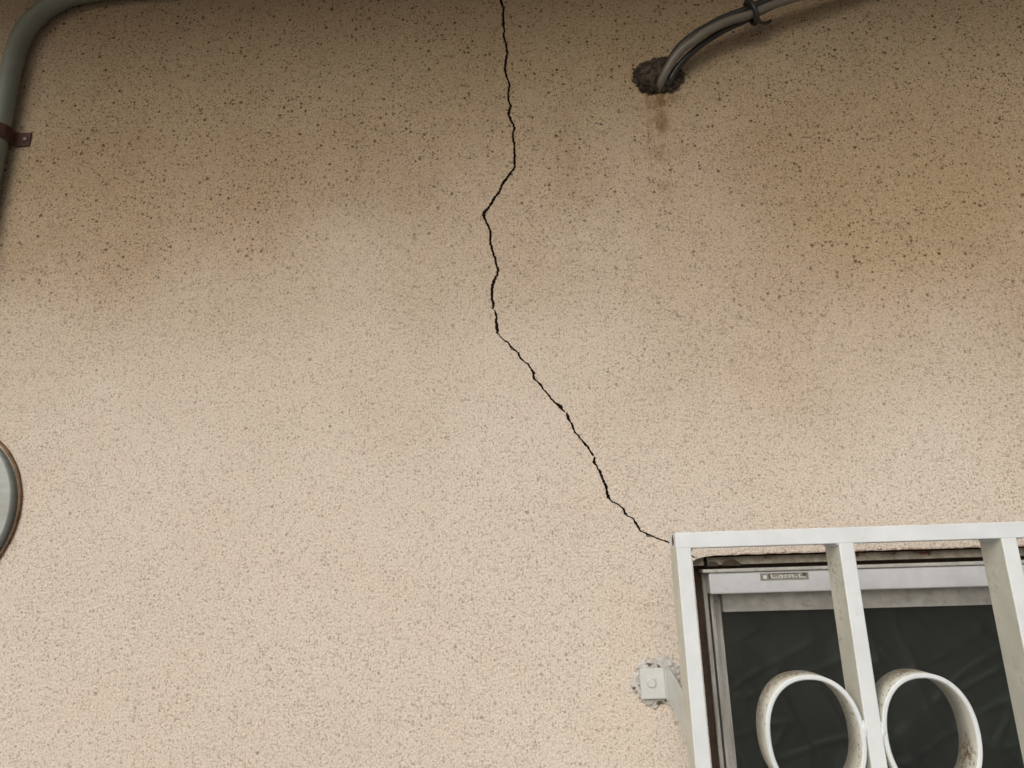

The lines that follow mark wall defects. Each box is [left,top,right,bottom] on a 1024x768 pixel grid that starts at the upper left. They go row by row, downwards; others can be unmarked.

crack [482,0,669,543]